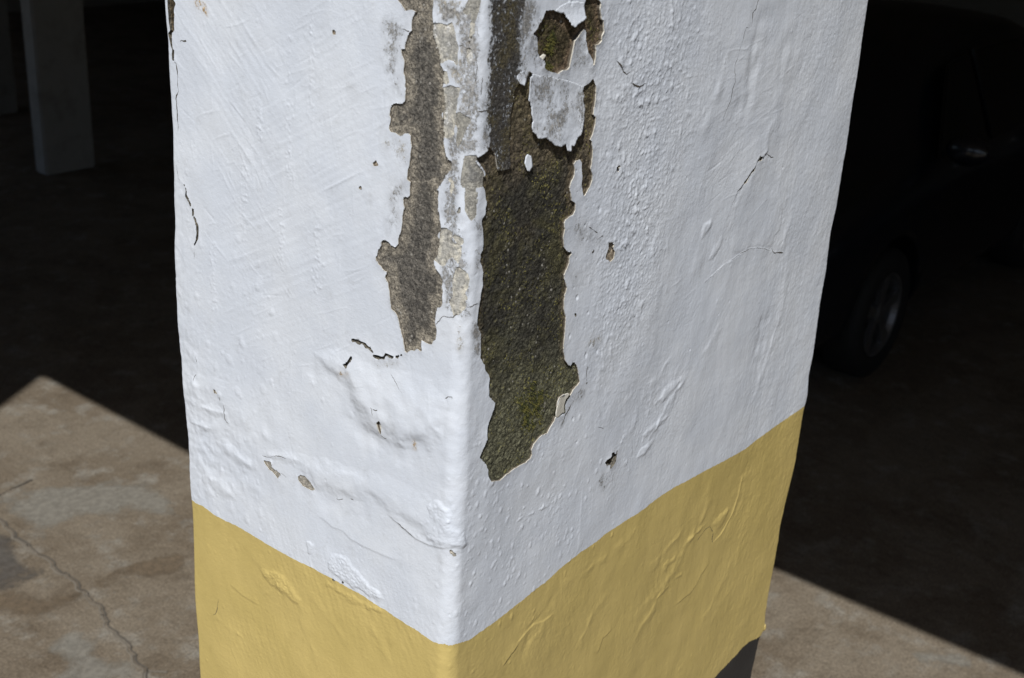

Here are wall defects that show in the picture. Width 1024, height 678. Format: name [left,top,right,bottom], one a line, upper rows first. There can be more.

crack [167,0,186,132]
crack [733,153,773,202]
crack [177,172,199,245]
spalling [376,0,605,482]
peeling [606,242,615,262]
crack [337,339,402,389]
peeling [298,475,314,490]